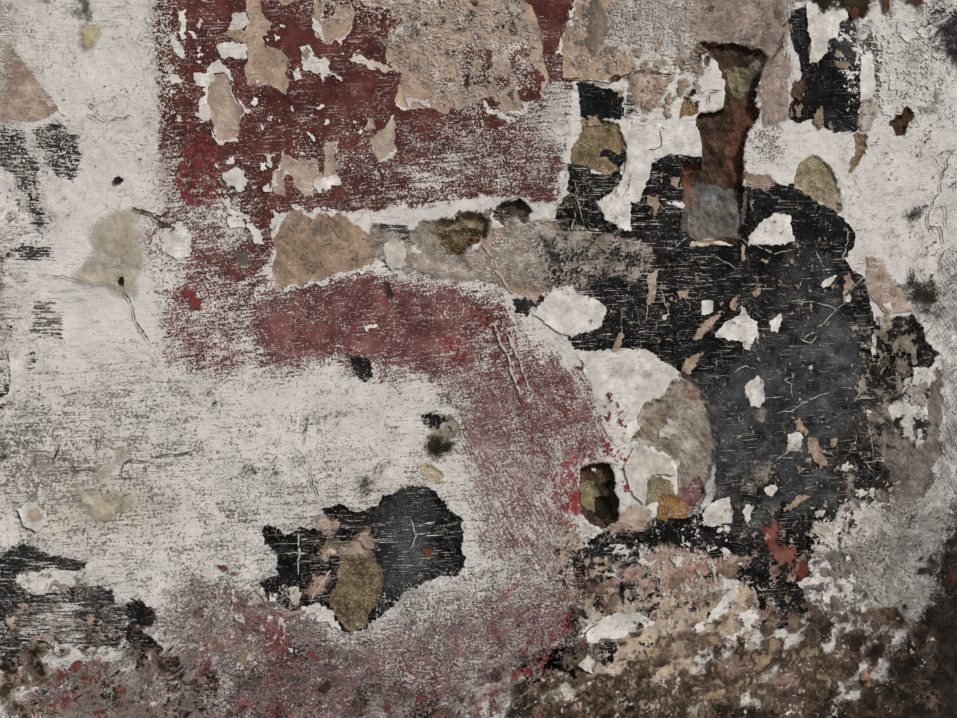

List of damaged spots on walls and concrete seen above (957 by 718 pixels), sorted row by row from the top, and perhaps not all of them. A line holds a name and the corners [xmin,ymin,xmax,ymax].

water stain [399,695,465,718]